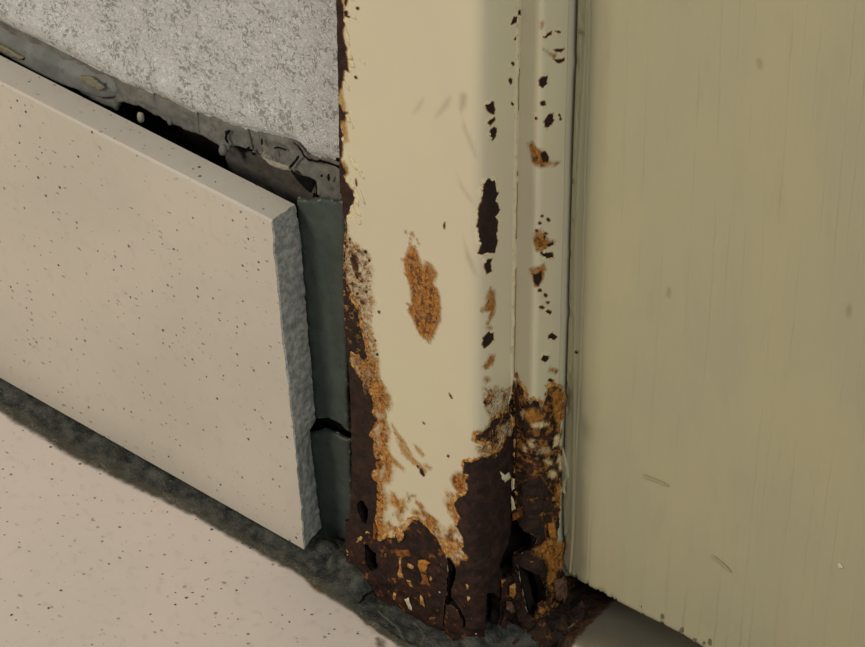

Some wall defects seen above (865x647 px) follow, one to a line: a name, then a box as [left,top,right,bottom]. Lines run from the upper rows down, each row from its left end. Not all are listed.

peeling [537,76,549,88]
peeling [482,98,498,142]
peeling [531,101,562,131]
peeling [540,147,550,163]
peeling [473,174,501,276]
peeling [531,215,556,318]
rust [336,0,615,647]
peeling [479,329,496,349]
peeling [539,330,558,364]
crack [317,418,351,433]